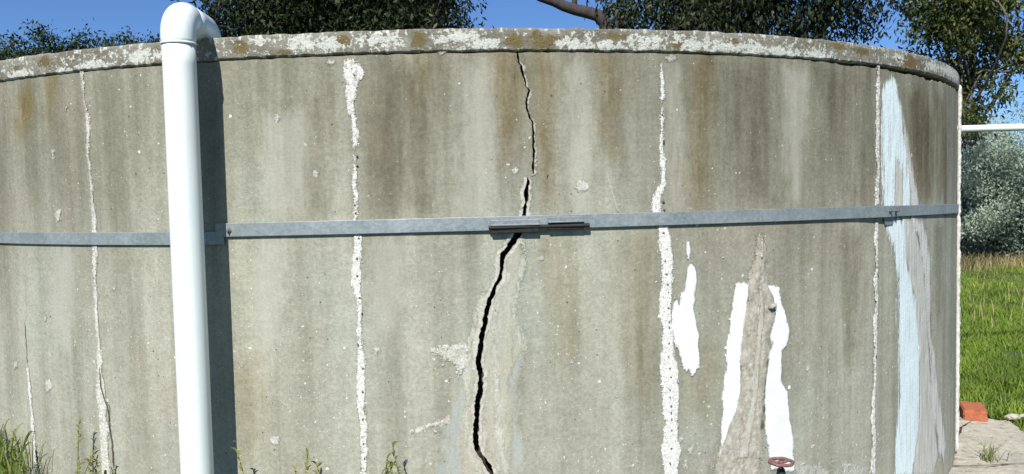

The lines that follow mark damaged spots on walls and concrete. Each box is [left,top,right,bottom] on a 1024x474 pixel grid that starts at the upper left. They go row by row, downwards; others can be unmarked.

damp [46,71,111,474]
damp [342,58,365,220]
crack [469,52,539,474]
damp [655,225,684,474]
damp [649,53,696,212]
damp [870,66,962,474]